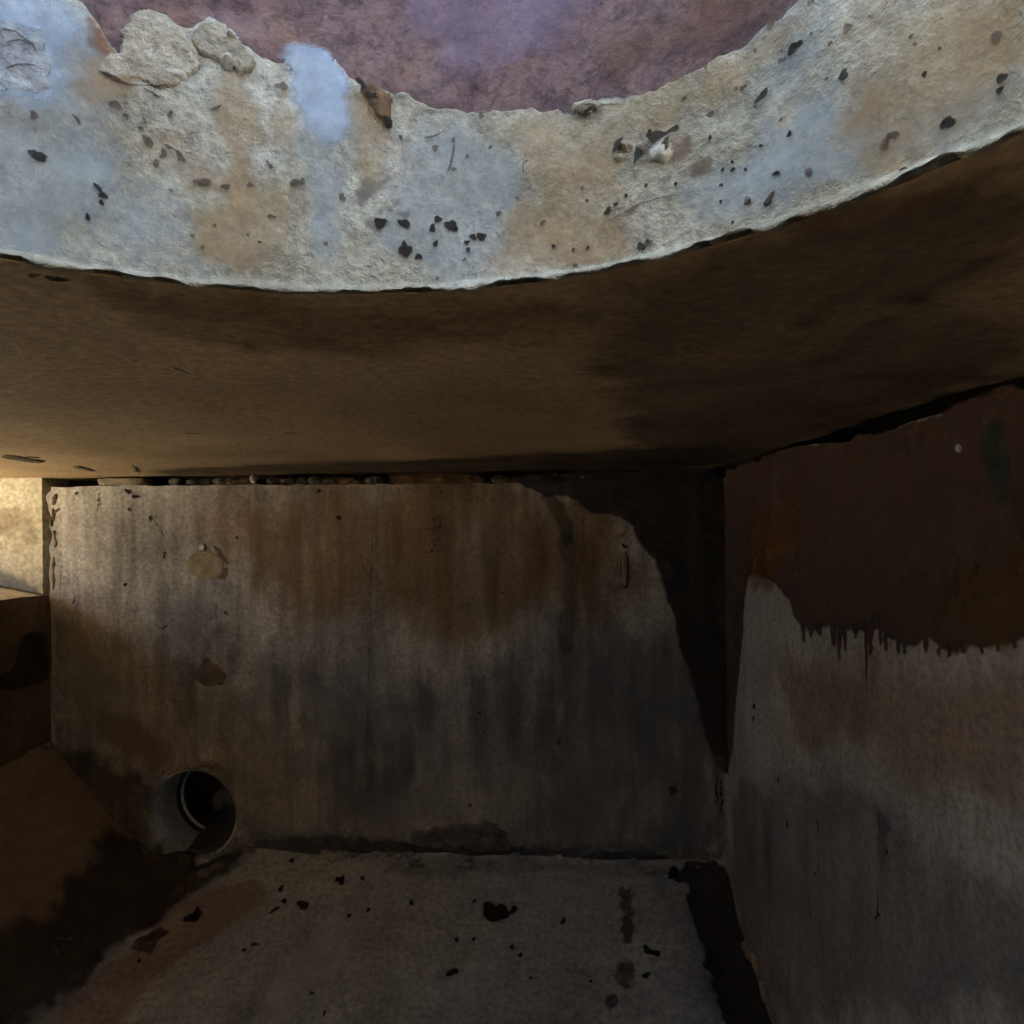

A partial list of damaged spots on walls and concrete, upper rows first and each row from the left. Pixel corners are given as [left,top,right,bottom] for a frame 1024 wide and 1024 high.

hole [778,31,813,64]
hole [108,100,129,120]
efflorescence [286,44,354,143]
spalling [356,77,403,140]
peeling [571,99,599,115]
leakage [72,377,1024,773]
leakage [60,750,150,852]
leakage [254,834,667,860]